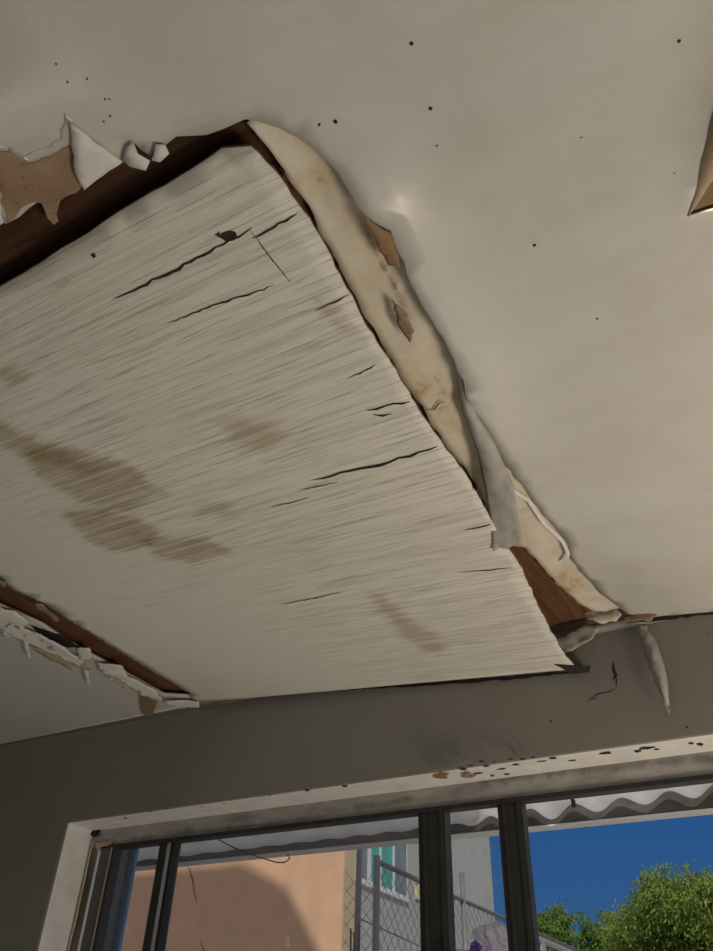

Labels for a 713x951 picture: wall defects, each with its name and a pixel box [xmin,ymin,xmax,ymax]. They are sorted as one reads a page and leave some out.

peeling [0,113,169,225]
peeling [688,113,713,217]
crack [114,214,297,323]
crack [367,402,409,417]
crack [271,446,438,507]
flaking render [0,609,200,708]